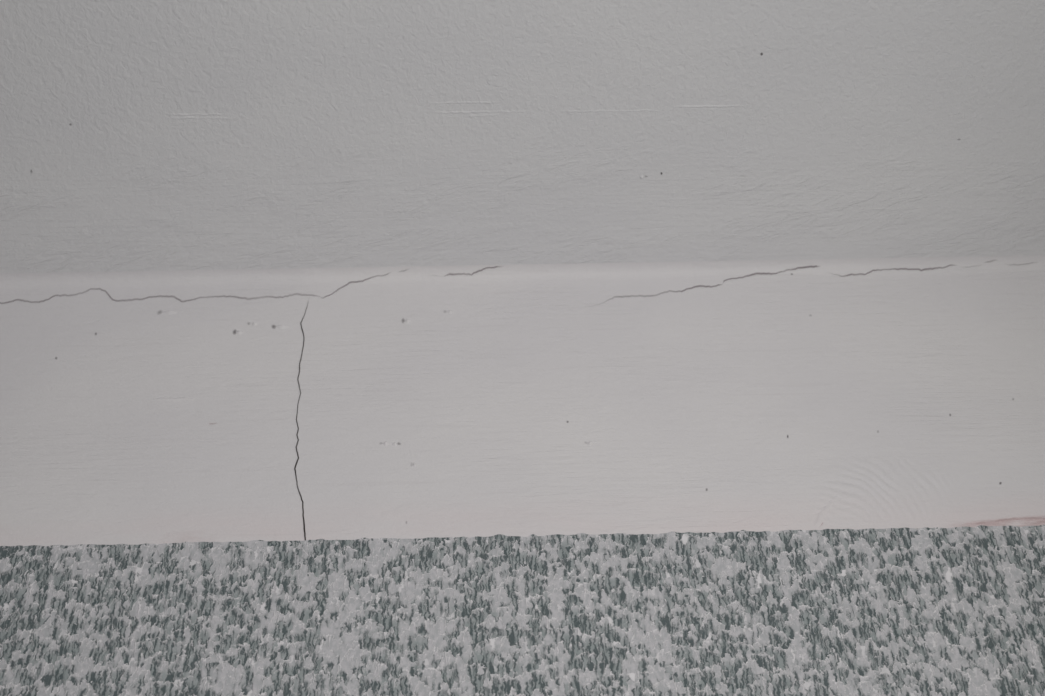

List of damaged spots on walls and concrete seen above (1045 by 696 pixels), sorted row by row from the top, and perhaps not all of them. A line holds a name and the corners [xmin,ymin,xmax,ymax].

crack [578,261,998,309]
crack [293,297,309,541]